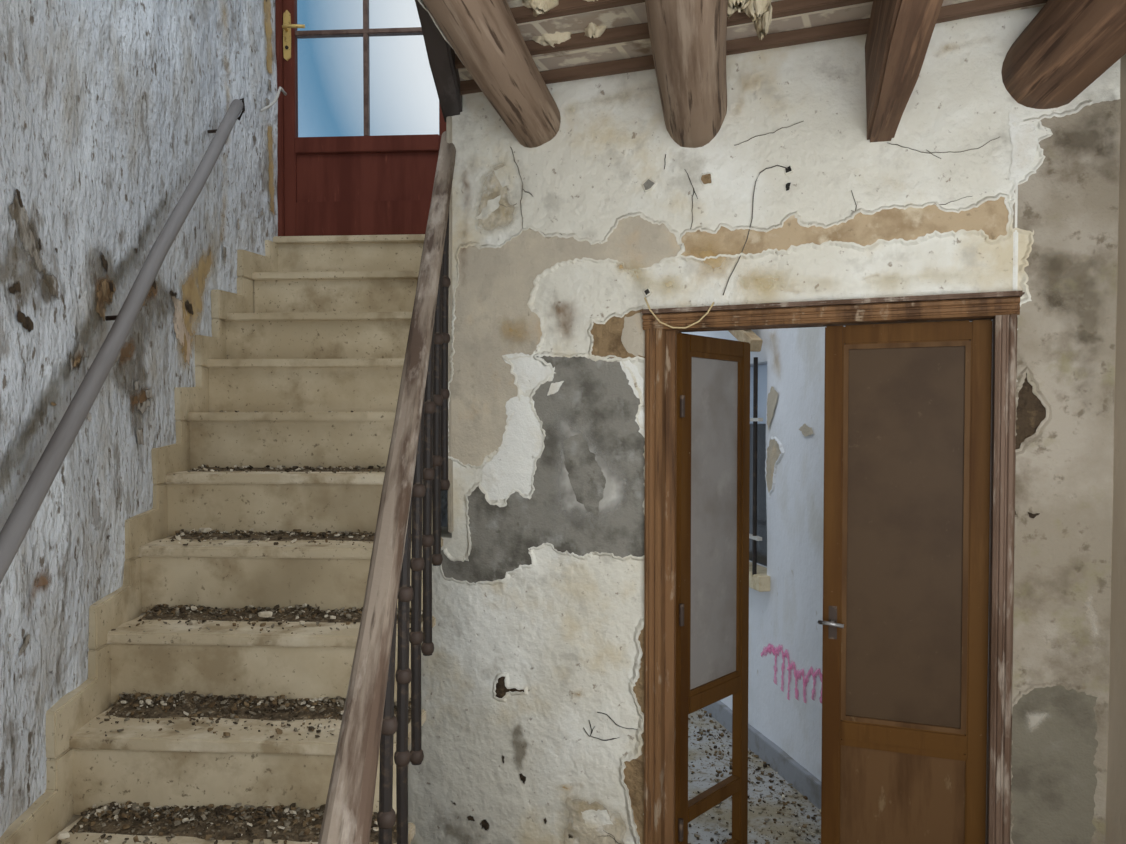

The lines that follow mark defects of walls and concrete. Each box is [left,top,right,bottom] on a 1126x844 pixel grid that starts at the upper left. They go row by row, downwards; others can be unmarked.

peeling [522,0,559,16]
peeling [532,22,607,47]
peeling [727,0,772,40]
crack [734,121,803,146]
crack [888,137,999,159]
peeling [4,189,59,299]
damp [1048,255,1099,341]
peeling [17,310,34,332]
peeling [170,291,194,366]
peeling [440,99,1121,844]